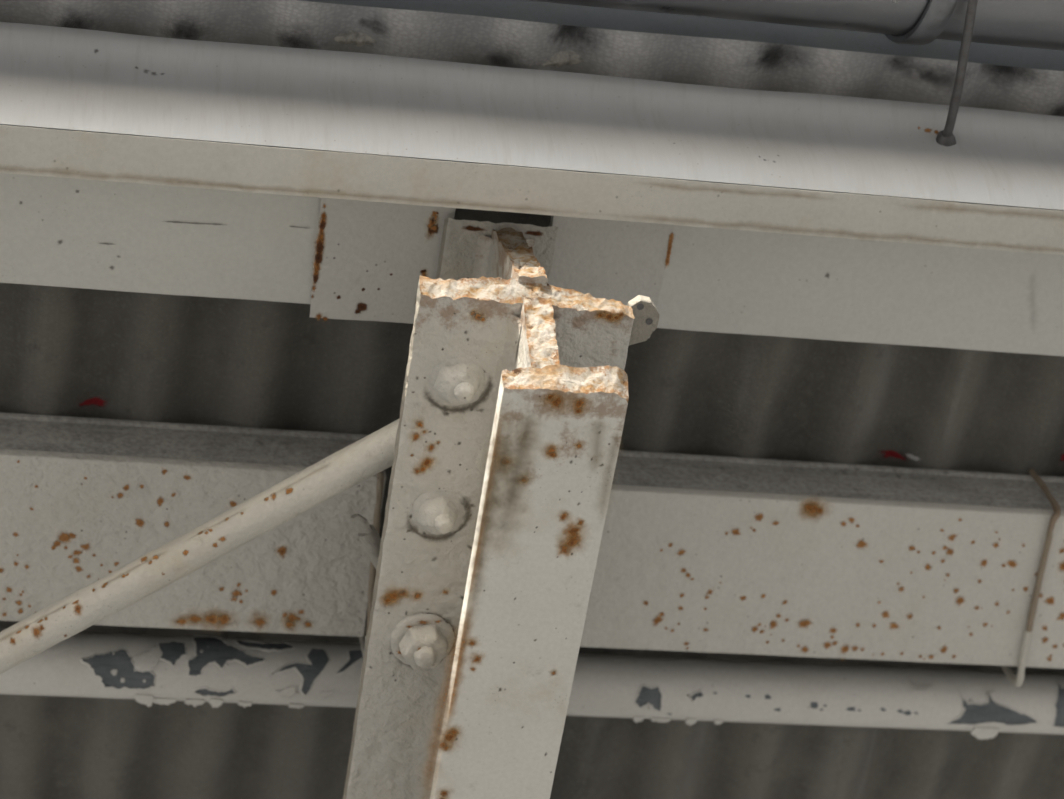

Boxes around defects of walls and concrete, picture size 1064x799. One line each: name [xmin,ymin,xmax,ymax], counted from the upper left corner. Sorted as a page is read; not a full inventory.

rust [428,211,439,236]
rust [311,205,326,298]
rust [561,513,583,553]
rust [52,533,128,592]
rust [909,529,982,610]
rust [10,617,47,644]
rust [752,601,811,644]
rust [824,628,884,660]
peeling [80,636,364,709]
peeling [633,684,672,723]
peeling [687,688,717,702]
peeling [945,679,1064,740]